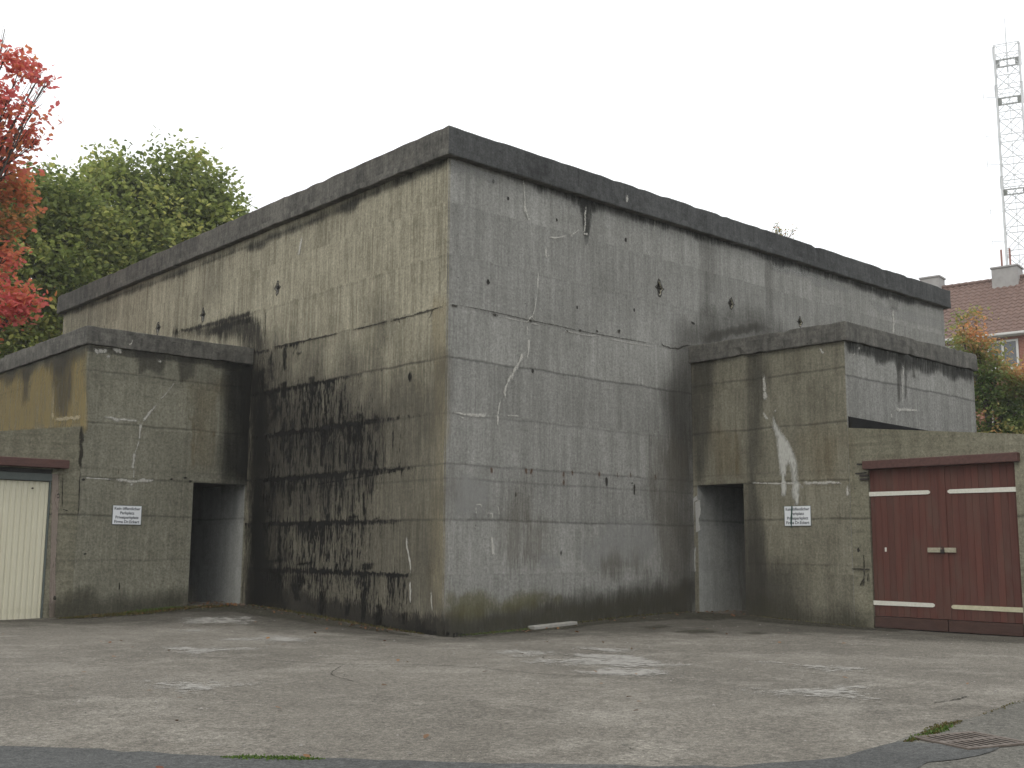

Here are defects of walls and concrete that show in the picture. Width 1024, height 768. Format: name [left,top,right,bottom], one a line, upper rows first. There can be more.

damp [176,312,251,336]
crack [264,211,695,425]
damp [847,342,976,417]
crack [105,384,174,477]
damp [42,341,905,677]
damp [781,685,878,699]